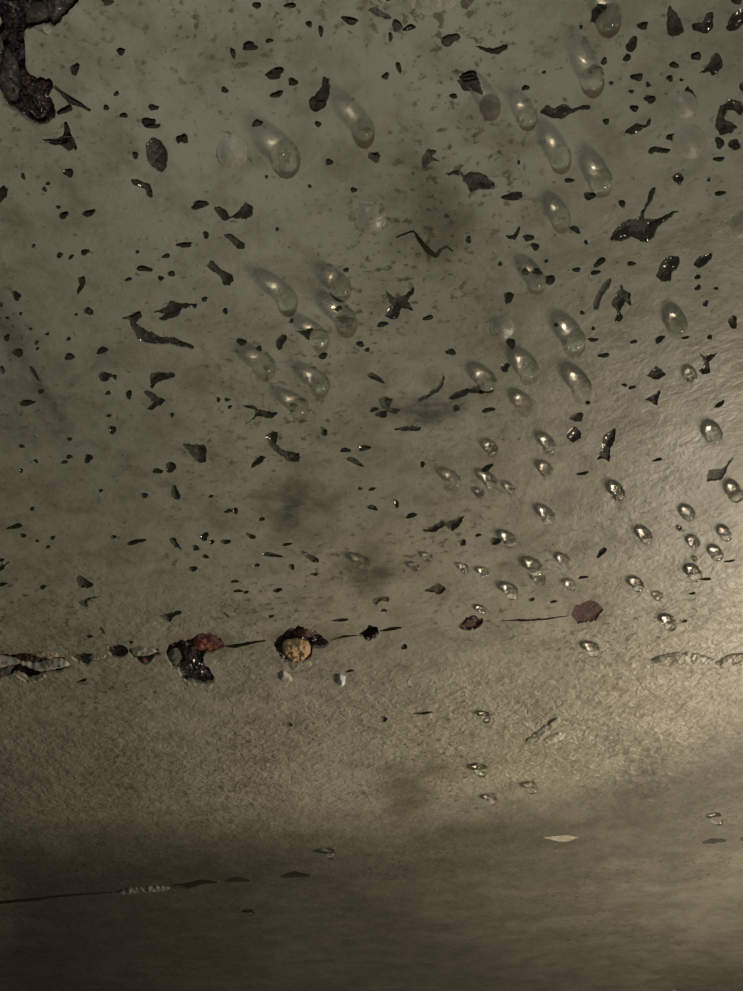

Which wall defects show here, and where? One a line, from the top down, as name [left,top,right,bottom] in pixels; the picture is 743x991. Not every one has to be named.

spalling [368,7,392,20]
spalling [0,0,91,151]
rust [571,600,604,624]
peeling [0,651,108,683]
spalling [128,633,225,690]
spalling [274,626,329,683]